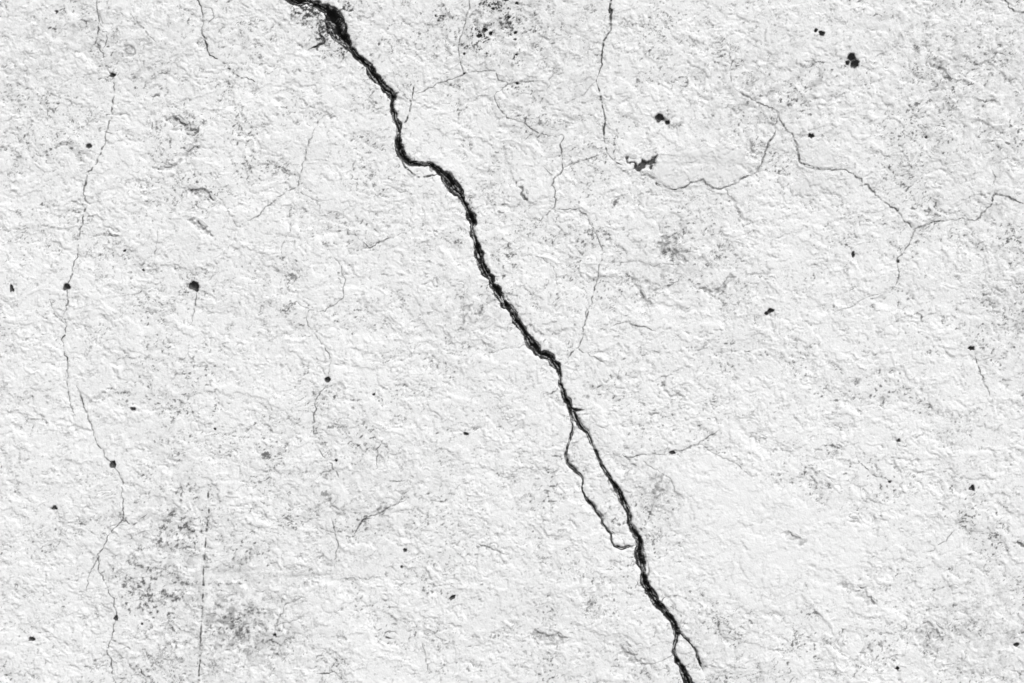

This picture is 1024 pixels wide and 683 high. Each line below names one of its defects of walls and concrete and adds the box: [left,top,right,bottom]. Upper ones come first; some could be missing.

crack [286,0,703,683]